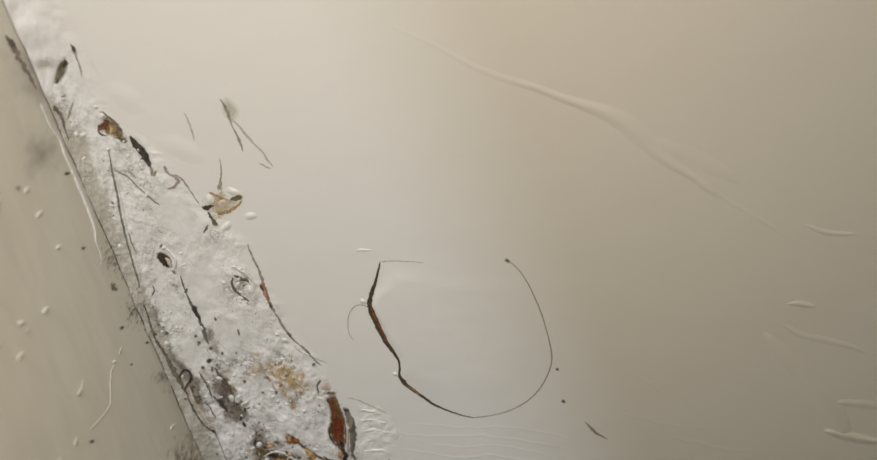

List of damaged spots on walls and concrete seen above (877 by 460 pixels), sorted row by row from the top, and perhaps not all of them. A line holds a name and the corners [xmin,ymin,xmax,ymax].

spalling [3,0,400,460]
crack [248,246,321,366]
water stain [229,394,250,427]